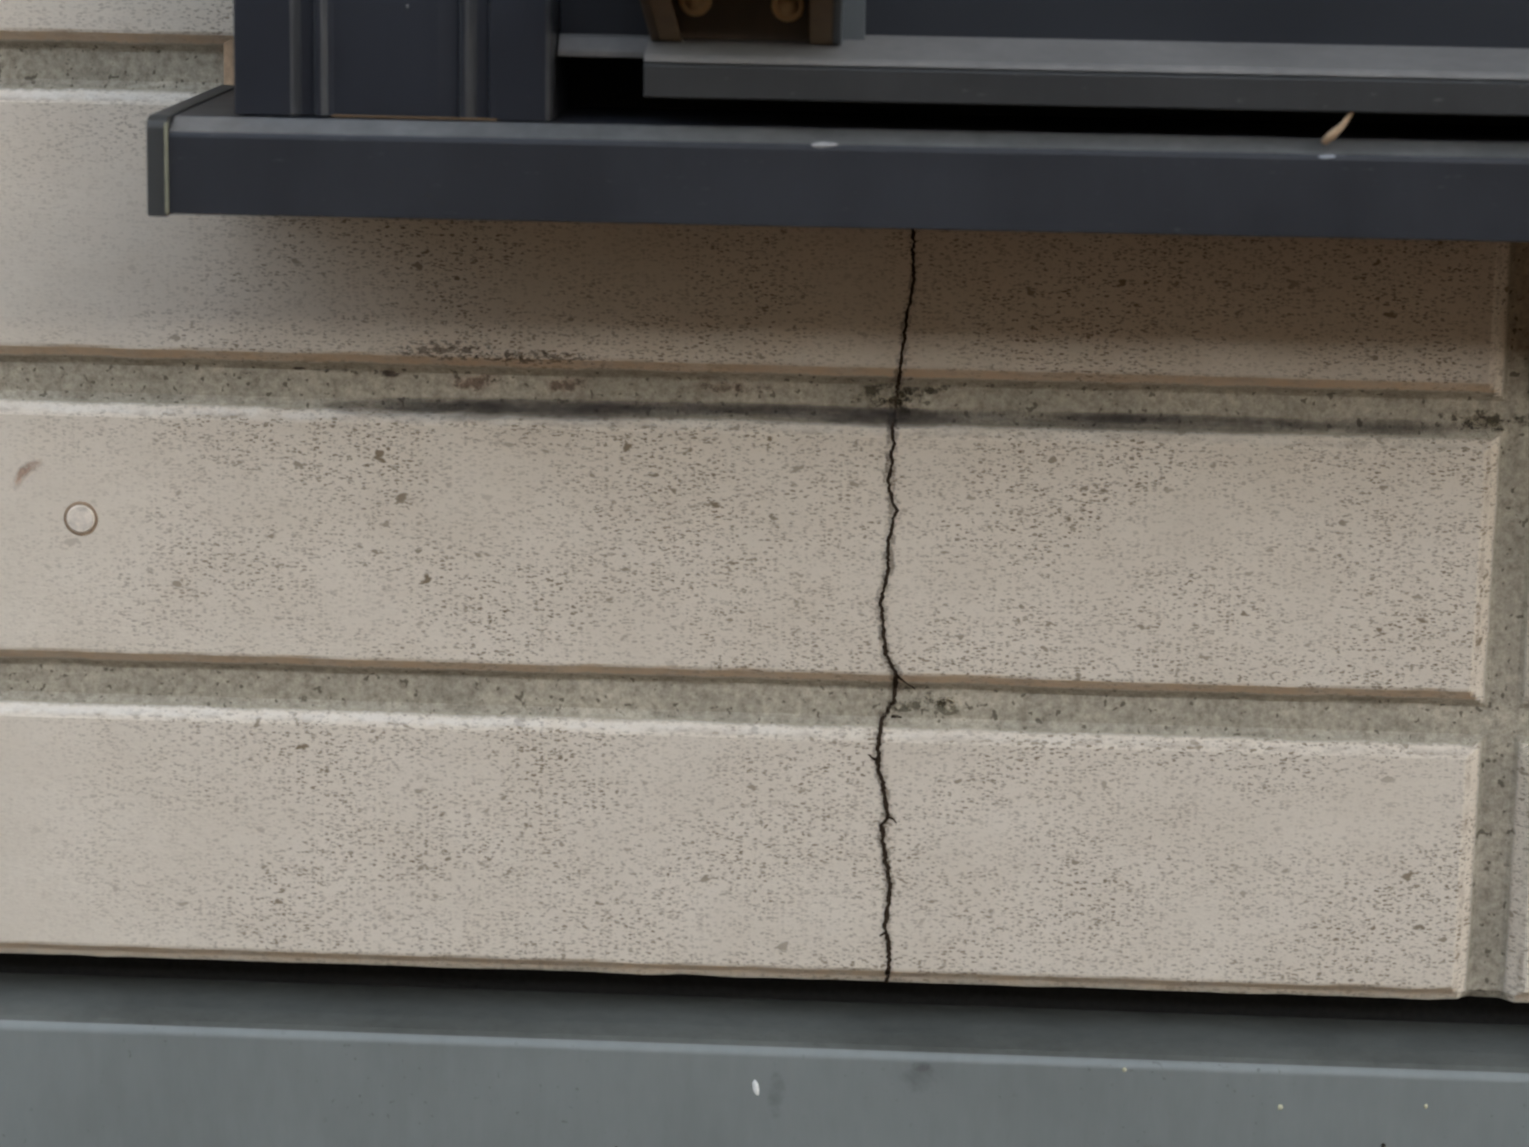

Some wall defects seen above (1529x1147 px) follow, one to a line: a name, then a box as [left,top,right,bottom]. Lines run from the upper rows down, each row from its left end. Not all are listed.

crack [868,229,916,983]